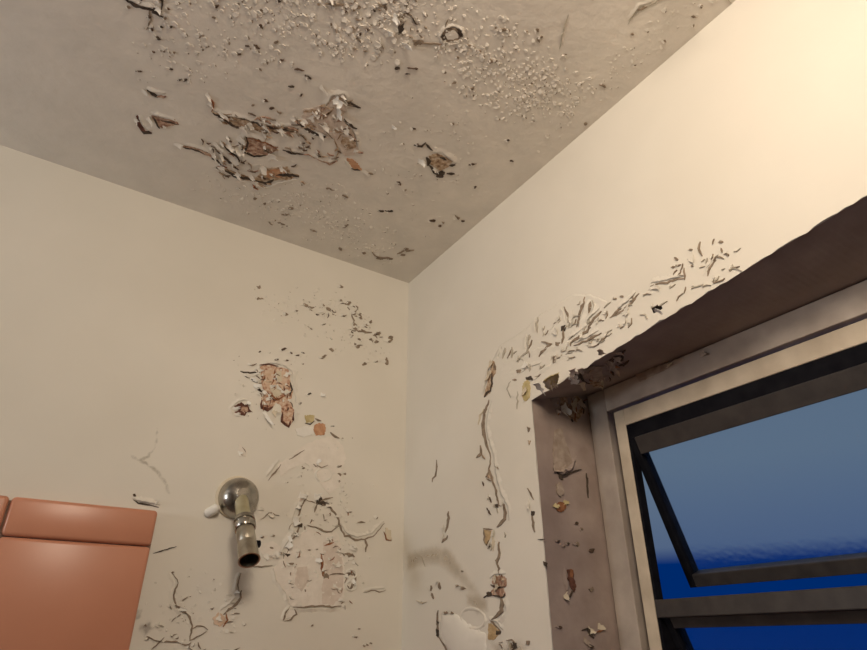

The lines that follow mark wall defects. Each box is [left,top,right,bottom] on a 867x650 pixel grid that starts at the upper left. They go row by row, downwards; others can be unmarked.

spalling [131,0,650,265]
peeling [254,285,393,366]
spalling [227,347,353,450]
peeling [481,349,629,422]
crack [476,400,545,551]
crack [138,568,246,650]
spalling [253,466,365,621]
crack [306,493,392,556]
crack [436,610,448,650]
crack [441,511,450,543]
spalling [562,567,576,601]
peeling [582,623,606,649]